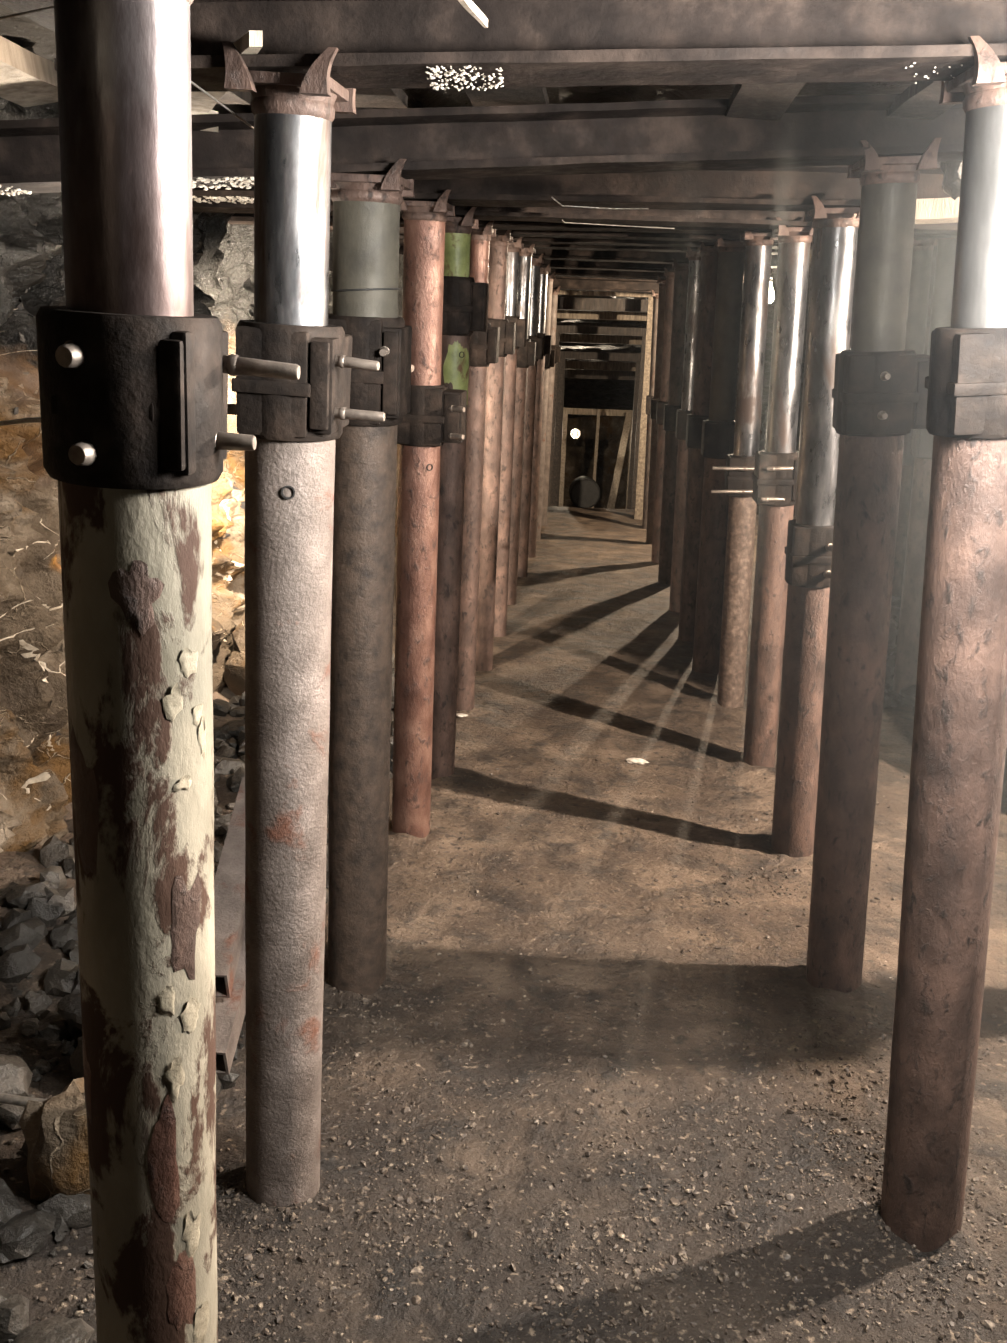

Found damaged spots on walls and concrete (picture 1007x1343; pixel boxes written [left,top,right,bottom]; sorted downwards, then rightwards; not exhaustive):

corrosion [108,560,165,636]
peeling [163,648,207,760]
corrosion [70,725,99,876]
corrosion [170,872,202,980]
peeling [157,985,201,1033]
corrosion [83,1032,92,1126]
peeling [165,1056,185,1102]
corrosion [147,1094,180,1222]
peeling [182,1210,201,1258]
corrosion [166,1250,196,1330]
peeling [192,1301,210,1343]